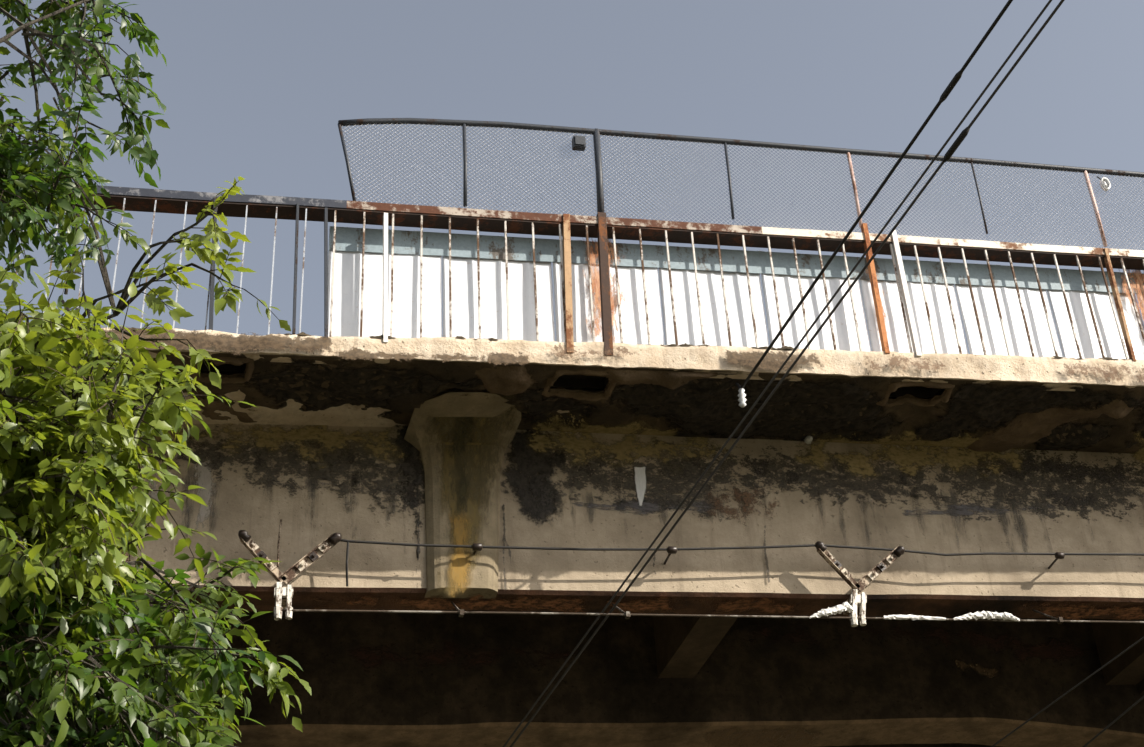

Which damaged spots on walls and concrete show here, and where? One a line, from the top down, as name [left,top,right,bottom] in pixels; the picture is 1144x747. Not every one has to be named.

corrosion [585,239,625,337]
corrosion [1121,269,1144,320]
spalling [191,396,257,423]
damp [149,425,425,535]
damp [426,395,1144,595]